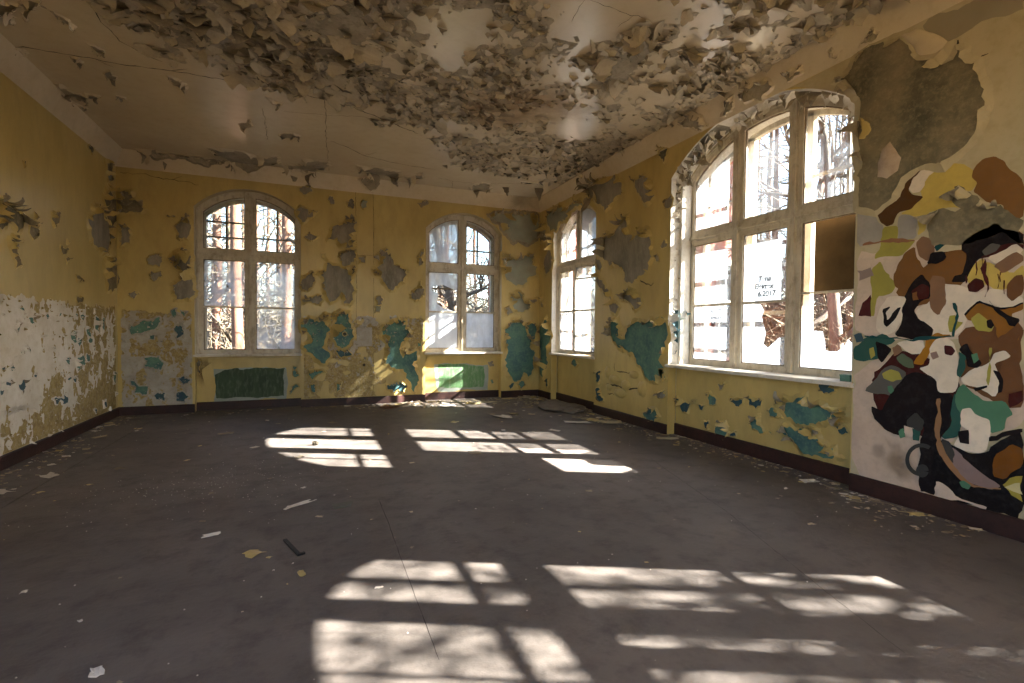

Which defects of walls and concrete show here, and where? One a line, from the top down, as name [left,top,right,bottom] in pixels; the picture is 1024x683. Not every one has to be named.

peeling [0,144,203,456]
peeling [86,0,995,463]